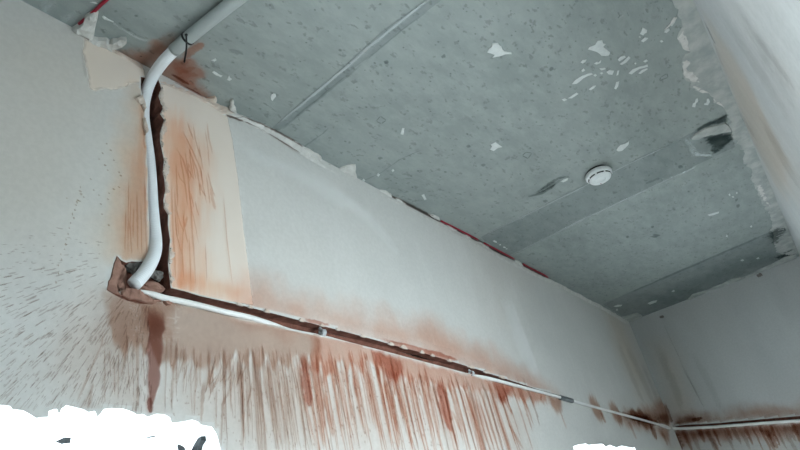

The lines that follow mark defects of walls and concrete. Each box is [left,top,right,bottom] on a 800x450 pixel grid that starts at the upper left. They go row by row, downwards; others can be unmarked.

peeling [72,2,127,52]
peeling [562,40,648,101]
peeling [677,31,726,130]
spalling [707,134,732,153]
peeling [120,288,172,306]